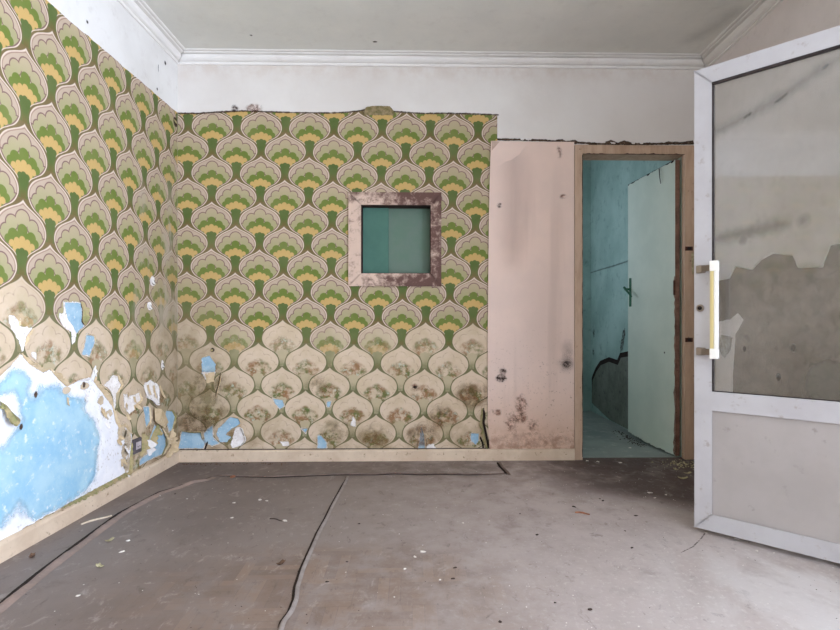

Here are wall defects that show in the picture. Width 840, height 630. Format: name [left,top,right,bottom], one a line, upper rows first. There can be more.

peeling [59,301,96,357]
peeling [0,314,246,540]
peeling [317,435,328,449]
water stain [460,385,485,406]
flaking render [582,328,628,429]
flaking render [719,243,840,401]
crack [0,408,511,630]